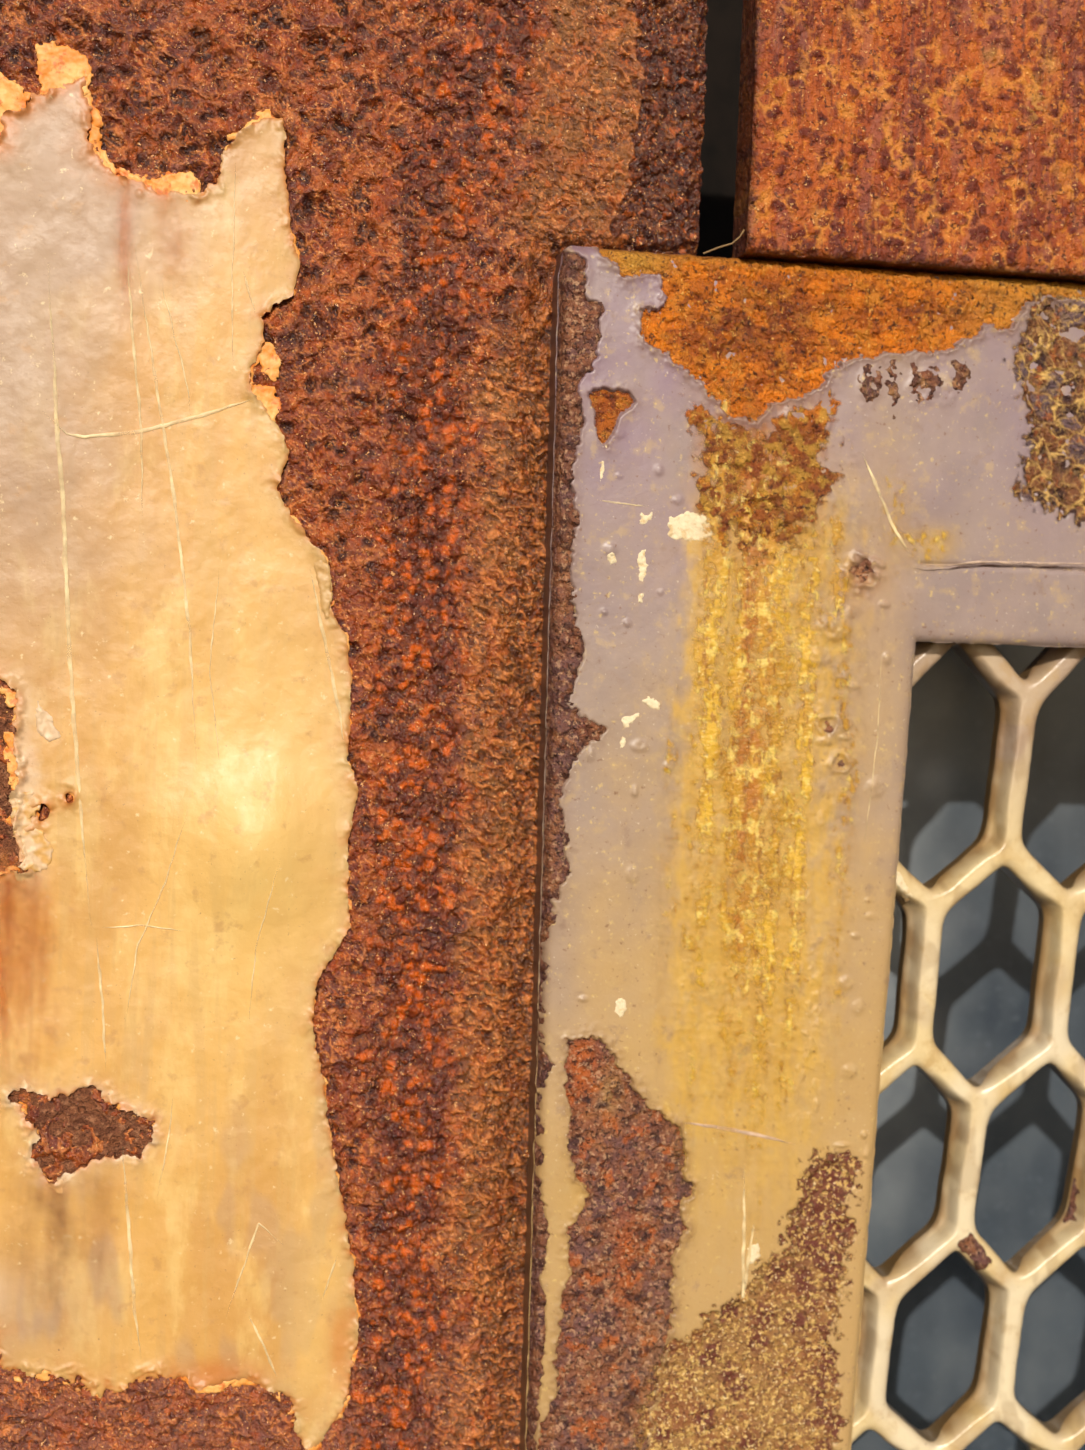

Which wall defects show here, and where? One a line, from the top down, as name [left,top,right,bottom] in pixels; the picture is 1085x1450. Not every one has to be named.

crack [866,462,905,544]
crack [926,561,1085,571]
corrosion [0,681,28,903]
peeling [0,41,361,1450]
corrosion [526,249,1085,1450]
corrosion [9,1085,155,1181]
peeling [747,1243,761,1264]